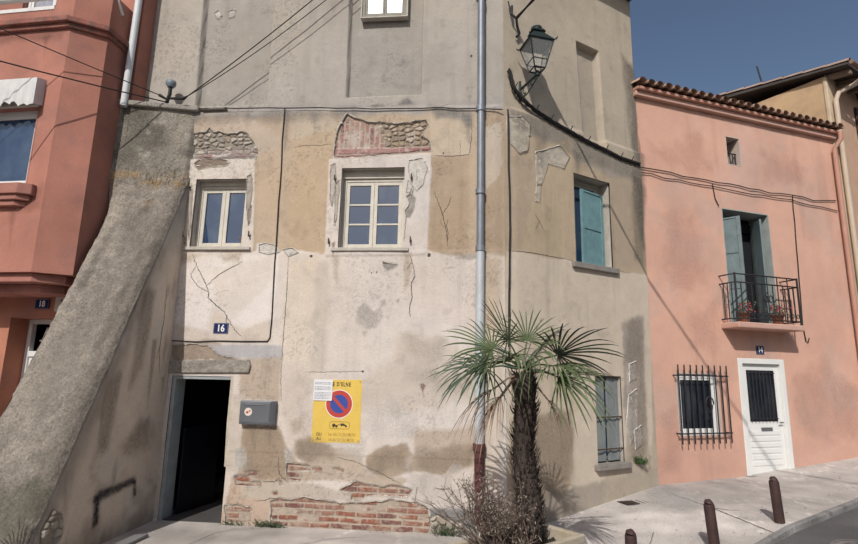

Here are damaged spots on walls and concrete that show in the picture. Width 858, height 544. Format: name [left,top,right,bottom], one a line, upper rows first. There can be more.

flaking render [188,128,258,175]
flaking render [329,113,444,225]
crack [191,255,242,337]
flaking render [233,471,261,488]
flaking render [268,462,462,535]